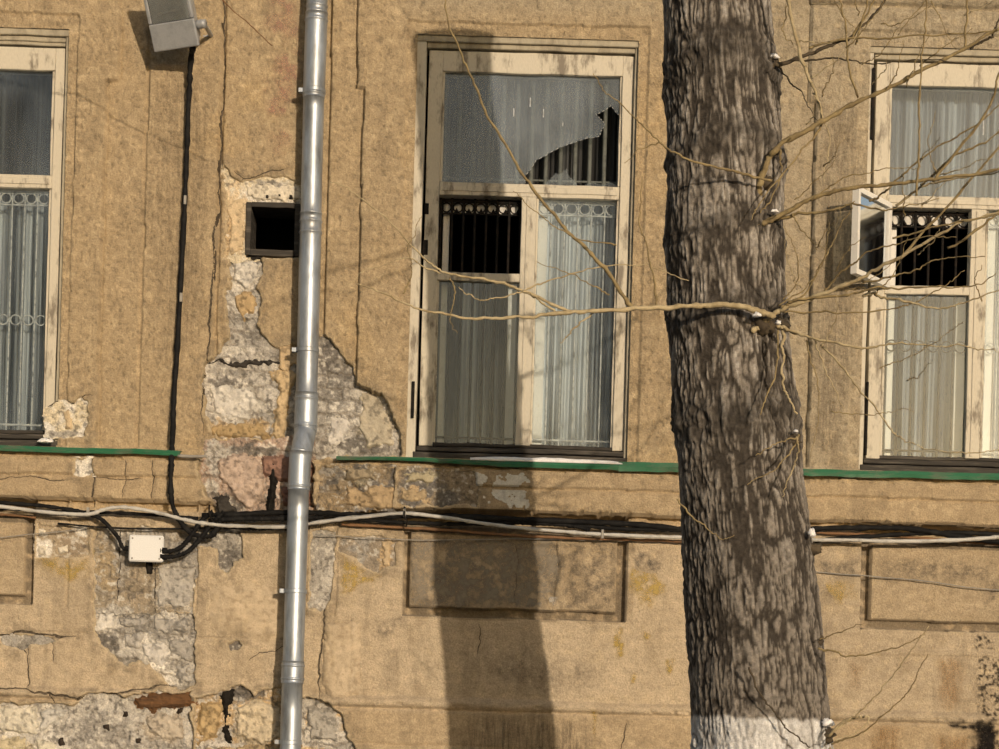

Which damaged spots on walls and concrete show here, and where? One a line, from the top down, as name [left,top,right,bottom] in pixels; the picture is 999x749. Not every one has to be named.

crack [200,2,283,432]
flaking render [0,164,301,749]
flaking render [307,335,530,611]
crack [0,630,197,703]
flaking render [301,697,356,749]
water stain [950,659,999,749]